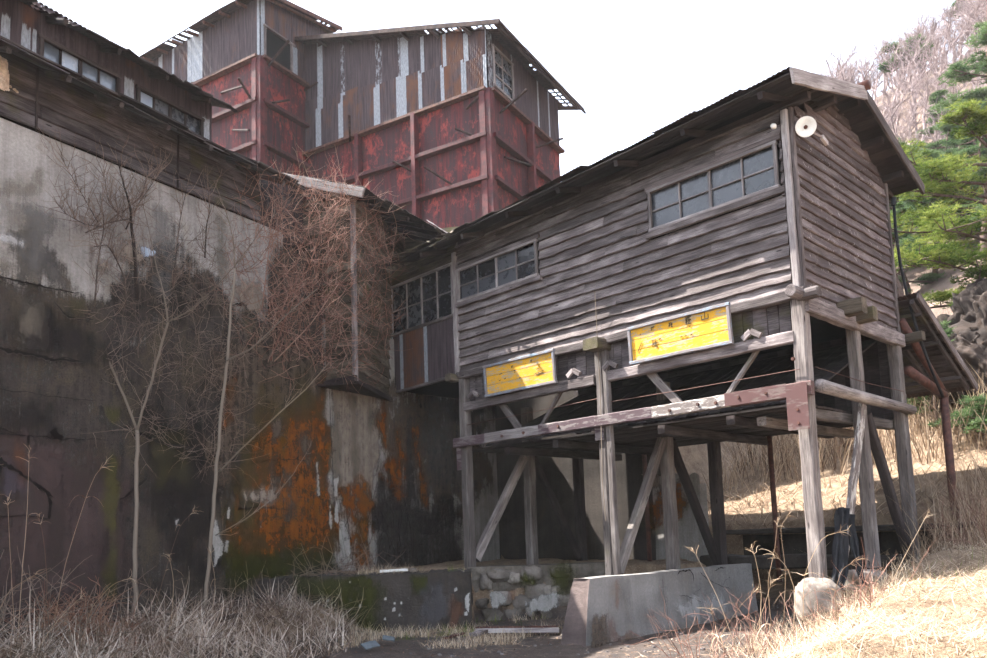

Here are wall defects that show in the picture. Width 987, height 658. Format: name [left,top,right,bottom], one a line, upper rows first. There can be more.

crack [0,276,93,362]
water stain [0,204,497,640]
crack [0,435,54,519]
peeling [212,507,231,567]
water stain [489,591,506,609]